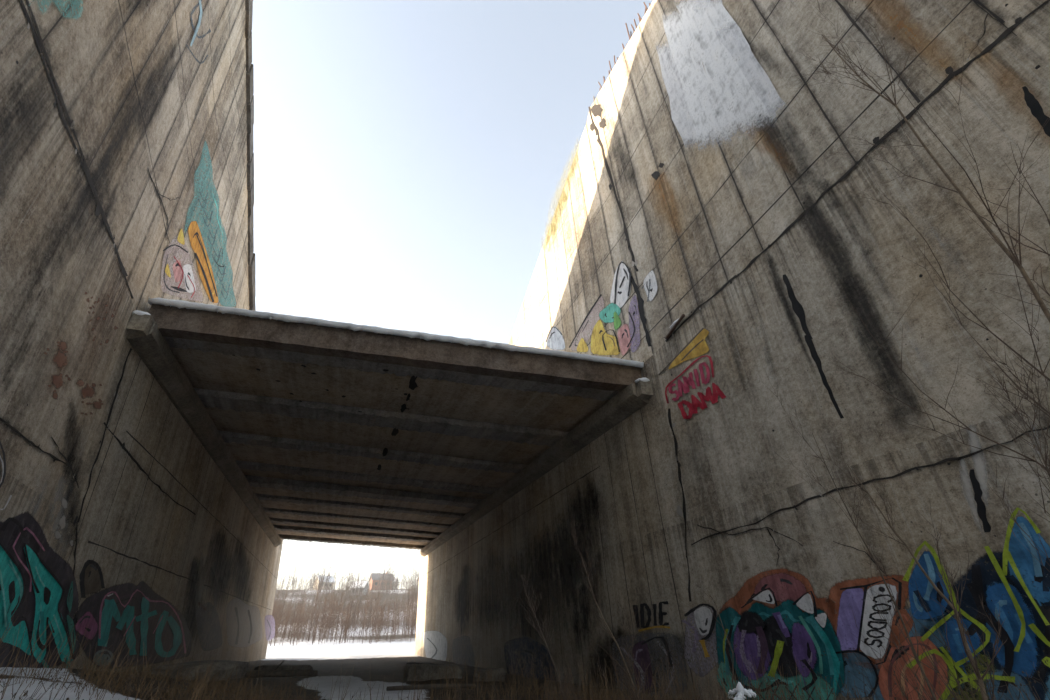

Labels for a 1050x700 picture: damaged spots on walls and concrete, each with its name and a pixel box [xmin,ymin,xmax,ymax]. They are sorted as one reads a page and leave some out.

crack [20,0,133,299]
water stain [44,35,182,265]
crack [588,107,638,272]
crack [665,0,1050,342]
water stain [51,413,81,551]
water stain [457,477,629,689]
crack [668,408,1050,602]